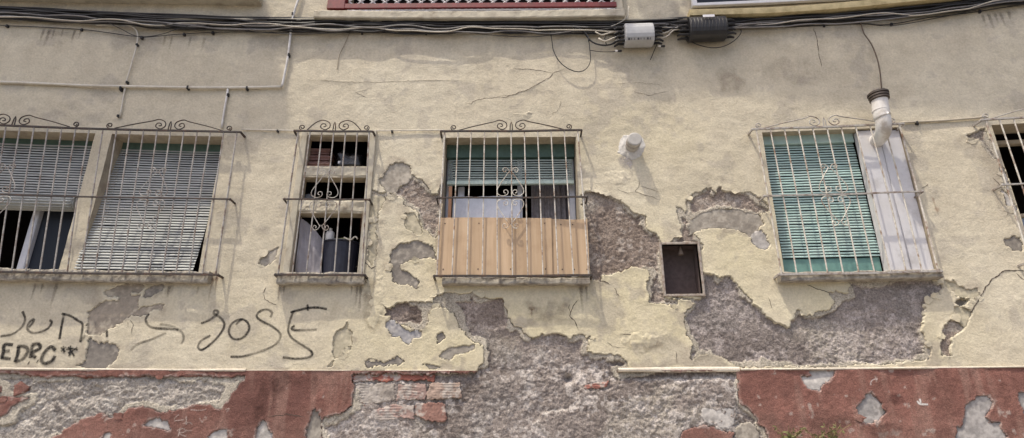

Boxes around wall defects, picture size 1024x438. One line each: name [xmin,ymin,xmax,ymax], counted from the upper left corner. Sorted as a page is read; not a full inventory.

crack [469,68,565,104]
spalling [367,163,443,289]
spalling [306,186,984,438]
crack [971,270,1024,312]
spalling [0,283,245,438]
peeling [256,420,273,438]
peeling [955,396,1006,438]